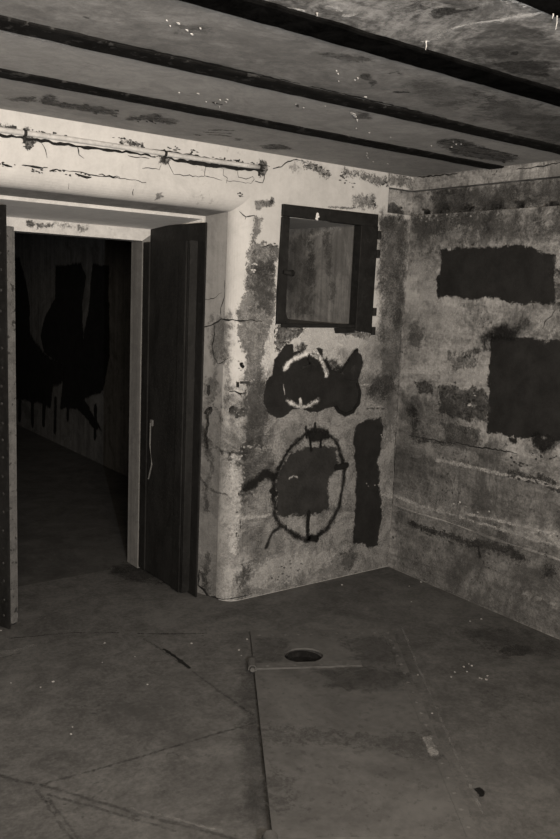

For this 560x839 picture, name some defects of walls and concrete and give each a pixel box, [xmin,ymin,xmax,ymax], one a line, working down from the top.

crack [0,133,270,194]
peeling [227,159,504,600]
water stain [363,375,560,657]
water stain [377,181,560,332]